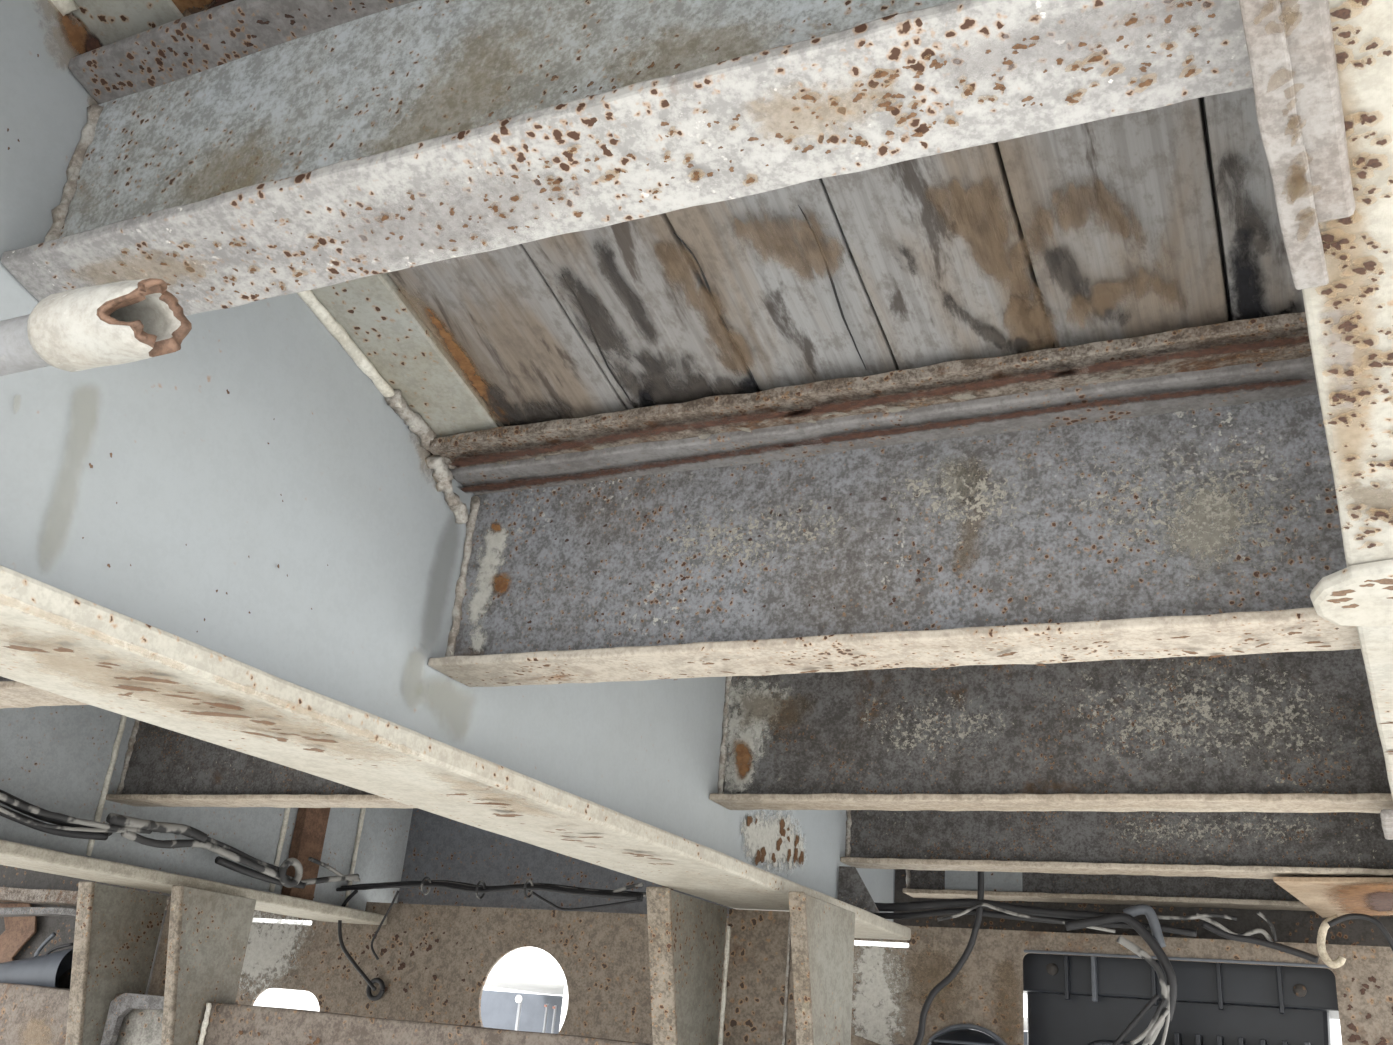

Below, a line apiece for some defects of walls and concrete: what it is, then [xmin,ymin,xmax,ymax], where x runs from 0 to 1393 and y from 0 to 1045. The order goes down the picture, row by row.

corrosion [1330,0,1392,68]
corrosion [419,36,1040,251]
corrosion [1344,114,1393,204]
corrosion [112,220,321,298]
corrosion [349,193,415,240]
water stain [735,213,843,279]
water stain [927,180,1180,354]
water stain [1216,155,1296,320]
corrosion [425,308,510,424]
corrosion [449,217,1393,467]
corrosion [459,380,1308,493]
corrosion [734,742,752,779]